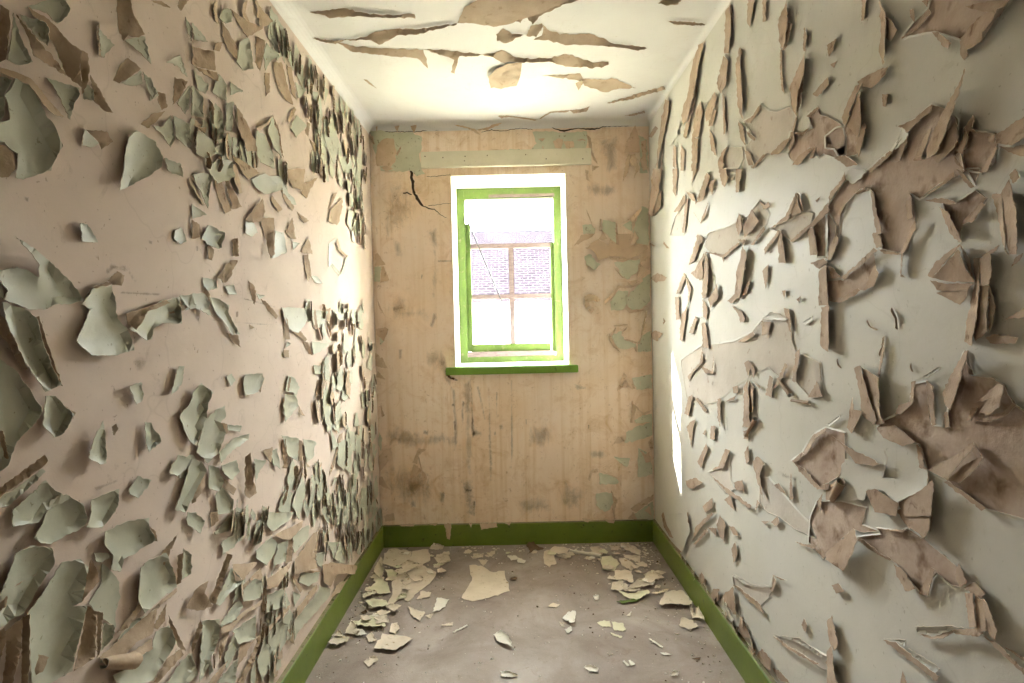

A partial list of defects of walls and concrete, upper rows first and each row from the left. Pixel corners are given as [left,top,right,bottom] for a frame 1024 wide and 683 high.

peeling [0,0,452,683]
crack [403,171,450,218]
peeling [311,0,1024,683]